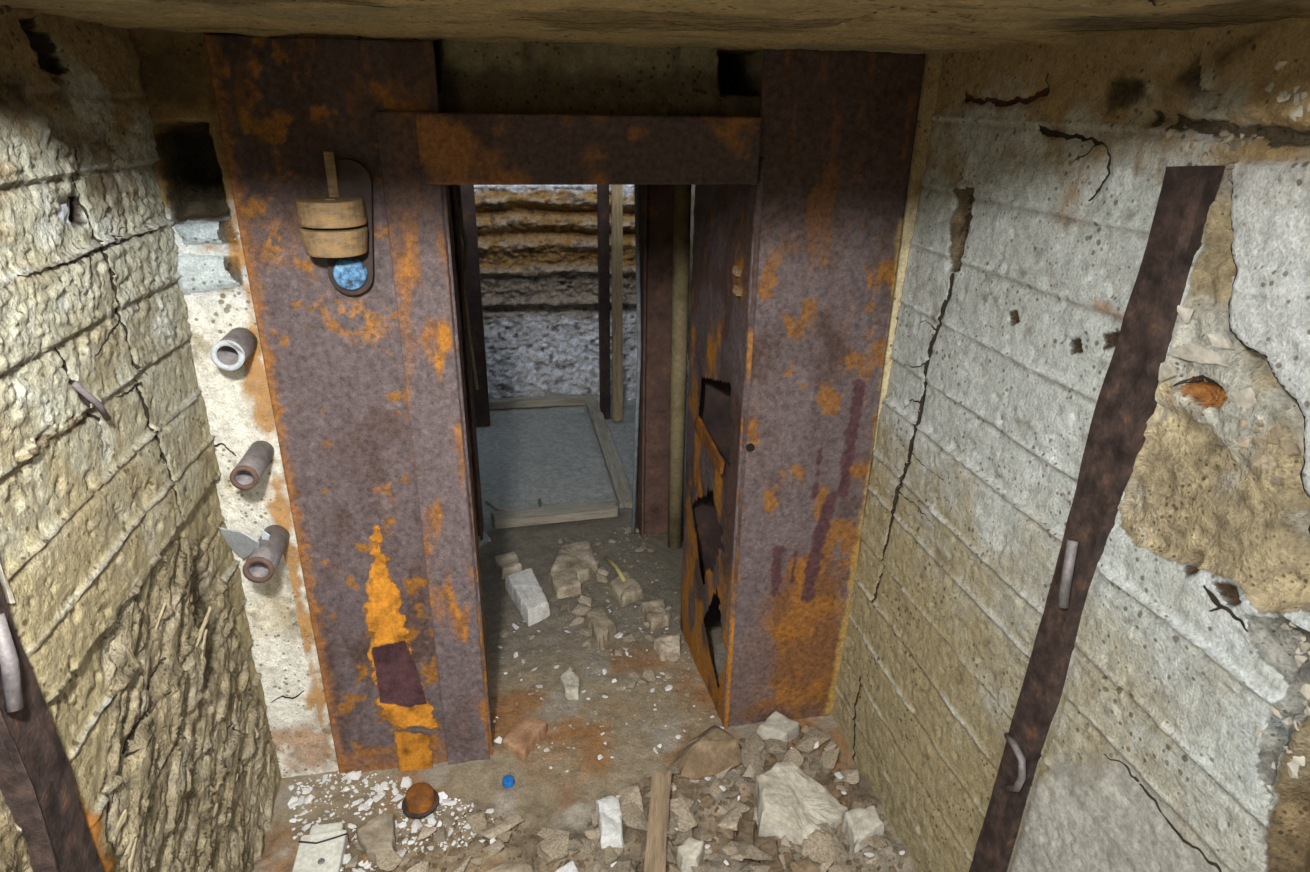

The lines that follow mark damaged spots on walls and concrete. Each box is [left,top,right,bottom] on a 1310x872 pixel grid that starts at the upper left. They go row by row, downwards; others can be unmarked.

crack [1038,124,1111,201]
crack [17,149,182,514]
corrosion [243,327,275,431]
crack [871,195,973,602]
spalling [1103,331,1120,349]
spalling [1119,60,1310,667]
corrosion [268,480,326,721]
corrosion [364,526,438,771]
spalling [1265,684,1310,872]